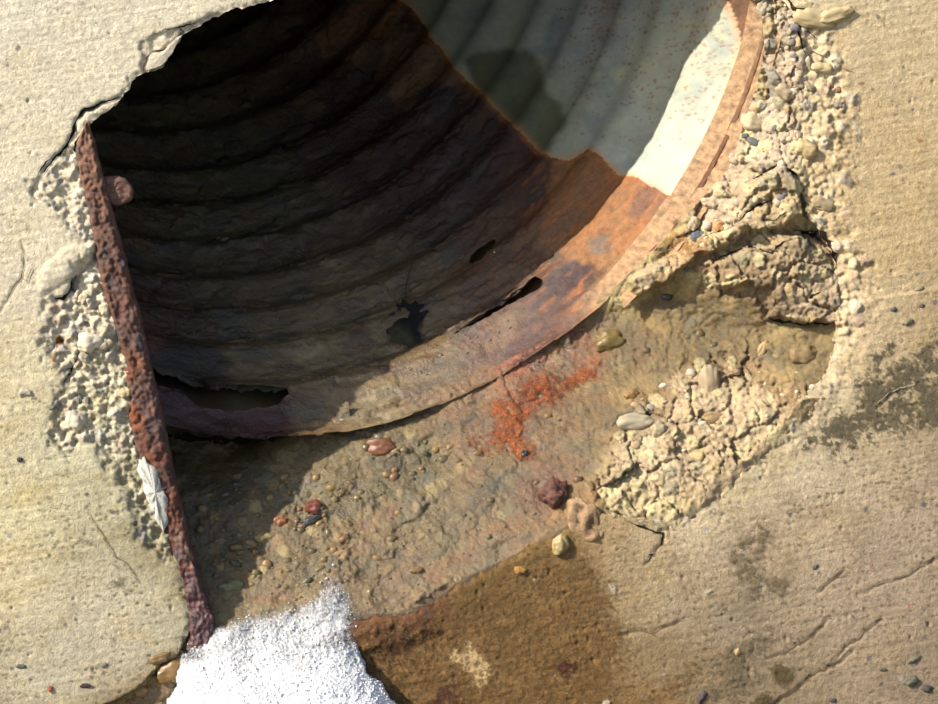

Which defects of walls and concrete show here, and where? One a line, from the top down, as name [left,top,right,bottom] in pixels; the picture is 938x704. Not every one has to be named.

spalling [140,12,225,71]
spalling [31,146,93,240]
crack [37,97,119,176]
corrosion [90,0,781,439]
crack [705,199,838,265]
crack [753,164,804,190]
spalling [740,5,875,430]
crack [769,318,834,326]
spalling [40,255,174,560]
corrosion [467,352,600,462]
water stain [801,340,938,453]
water stain [449,641,491,693]